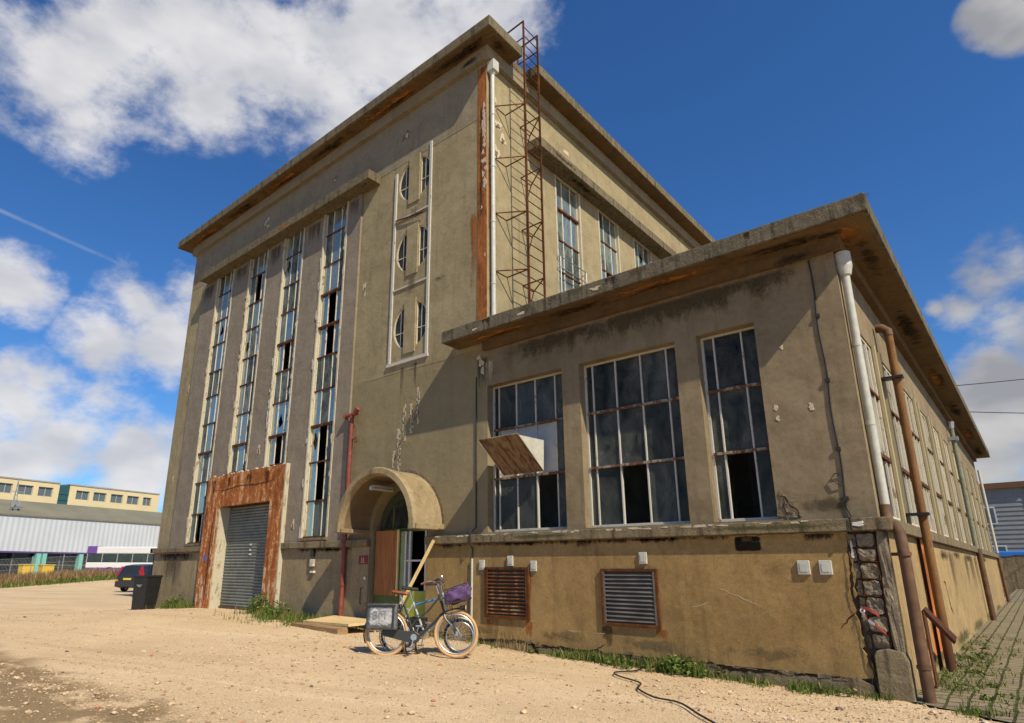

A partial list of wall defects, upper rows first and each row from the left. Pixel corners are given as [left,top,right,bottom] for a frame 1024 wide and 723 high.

peeling [481,98,506,188]
corrosion [471,65,491,320]
leakage [465,304,530,342]
leakage [522,226,881,354]
corrosion [212,469,280,493]